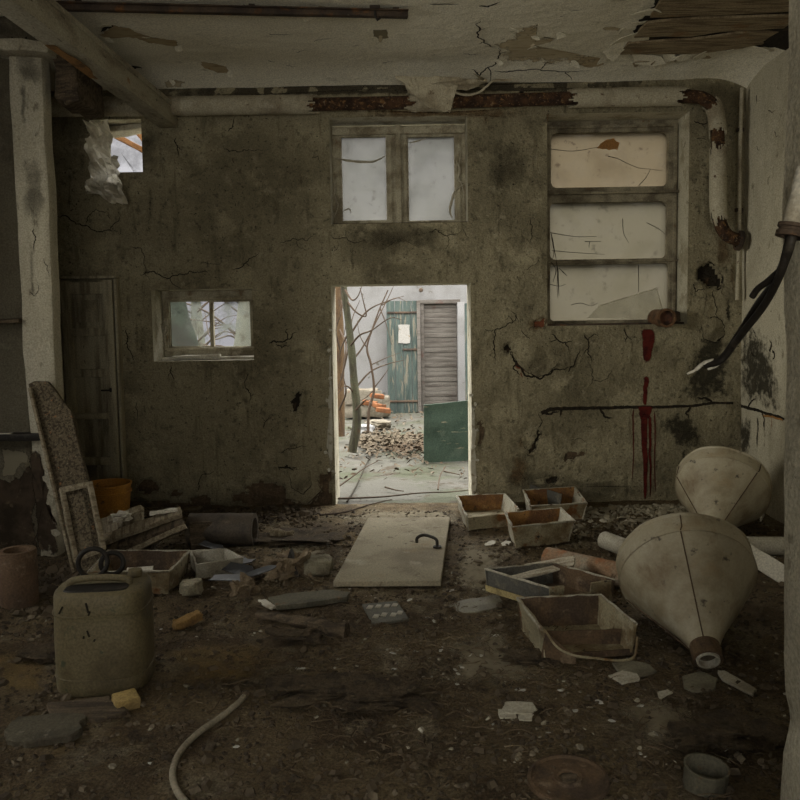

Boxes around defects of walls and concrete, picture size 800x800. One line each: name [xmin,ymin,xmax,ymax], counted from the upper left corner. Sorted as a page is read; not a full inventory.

peeling [493,8,769,68]
crack [57,209,259,288]
flaking render [697,260,724,290]
crack [485,311,612,386]
damp [741,331,777,410]
crack [538,397,784,428]
flaking render [0,448,61,555]